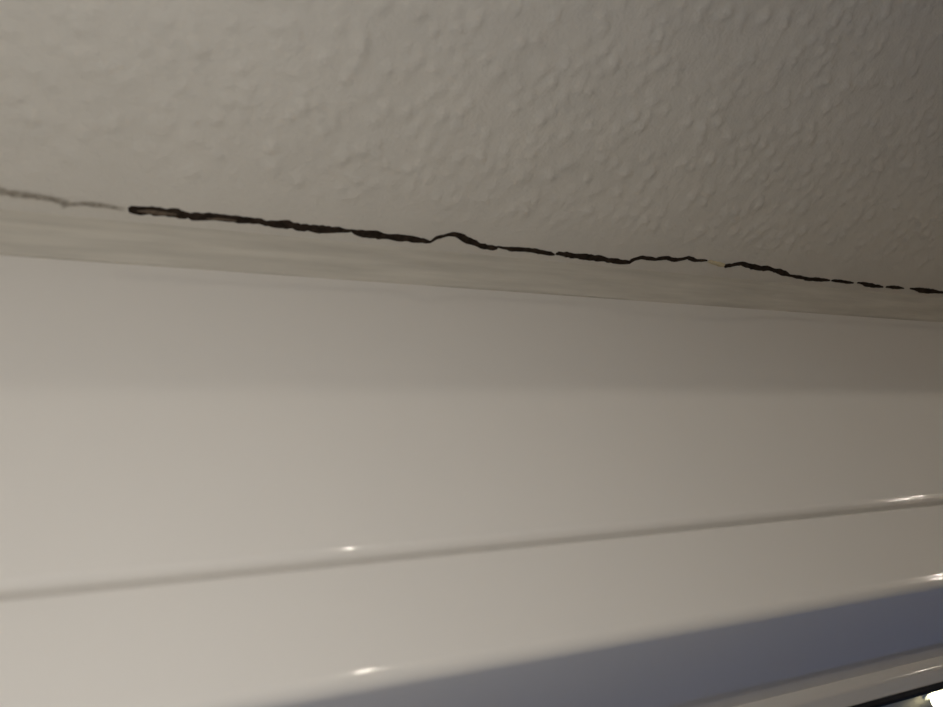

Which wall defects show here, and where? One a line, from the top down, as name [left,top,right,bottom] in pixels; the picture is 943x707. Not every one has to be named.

crack [8,192,943,294]